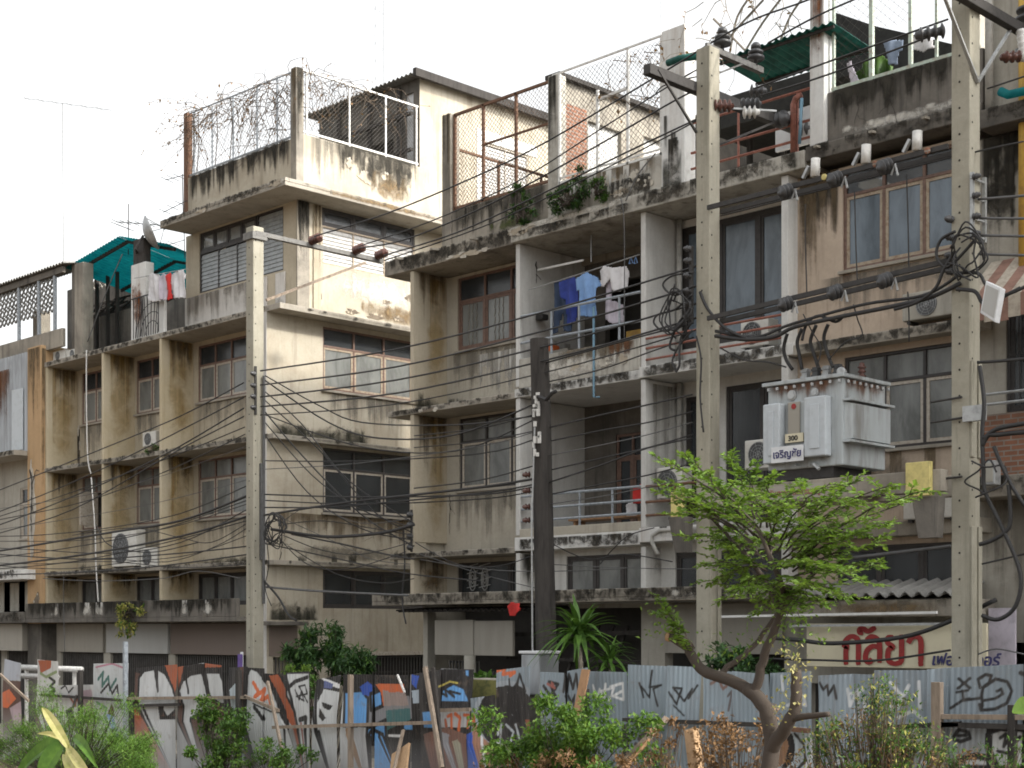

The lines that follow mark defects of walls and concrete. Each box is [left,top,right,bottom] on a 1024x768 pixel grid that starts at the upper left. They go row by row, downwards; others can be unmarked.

water stain [832,56,952,147]
water stain [162,132,299,225]
mould [720,151,796,185]
water stain [331,115,696,328]
water stain [800,169,837,249]
water stain [28,313,245,399]
water stain [392,397,480,444]
water stain [52,429,246,488]
water stain [48,566,147,584]
water stain [0,598,229,622]
water stain [555,586,696,601]